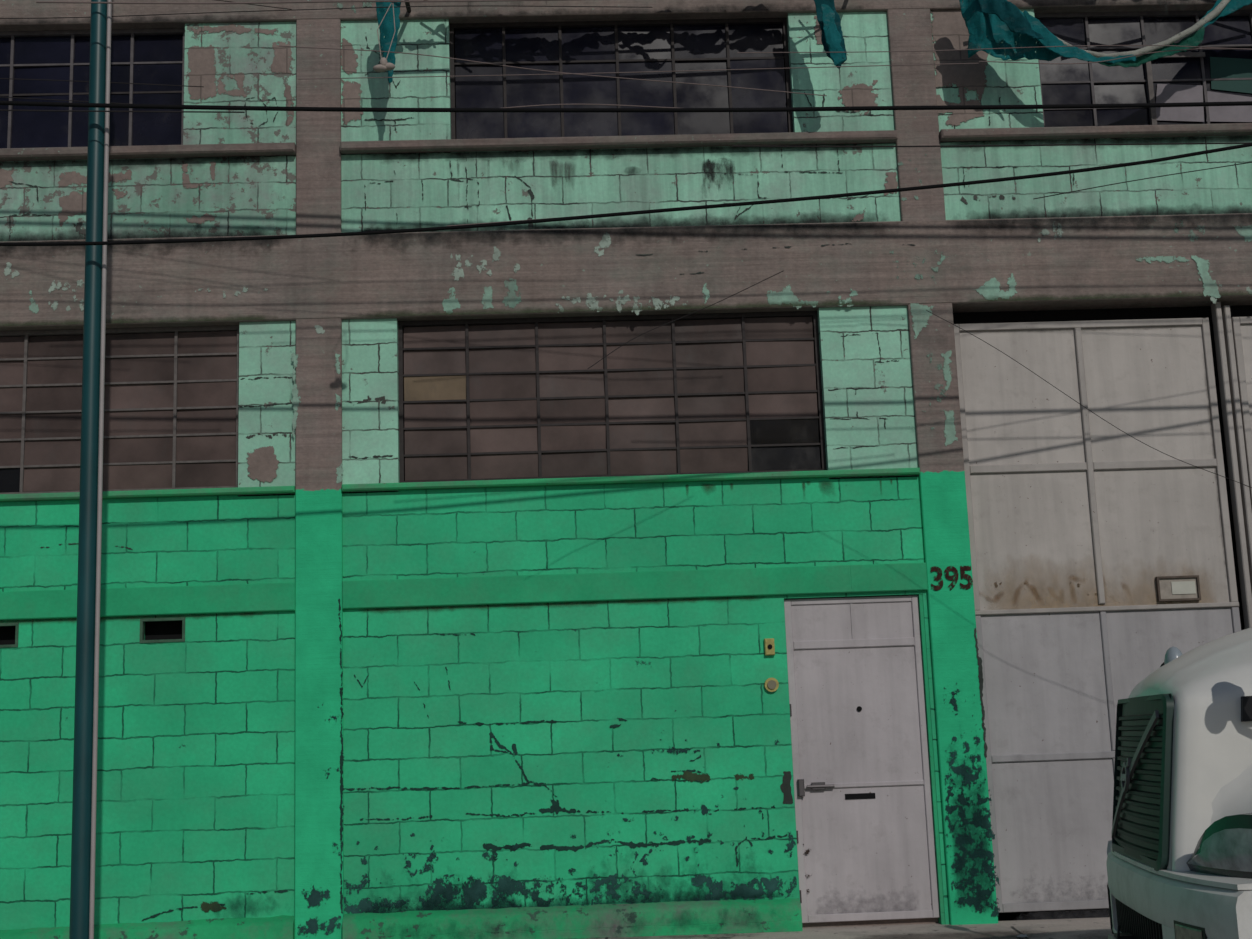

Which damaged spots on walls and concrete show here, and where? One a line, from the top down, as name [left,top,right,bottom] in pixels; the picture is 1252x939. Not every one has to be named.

peeling [187,24,294,126]
peeling [56,171,87,235]
peeling [442,246,522,313]
peeling [556,290,686,315]
peeling [246,346,301,483]
crack [338,599,787,914]
spalling [672,769,711,783]
spalling [694,773,754,816]
spalling [780,771,793,804]
spalling [945,715,1000,917]
spalling [295,839,663,938]
spalling [642,830,811,901]